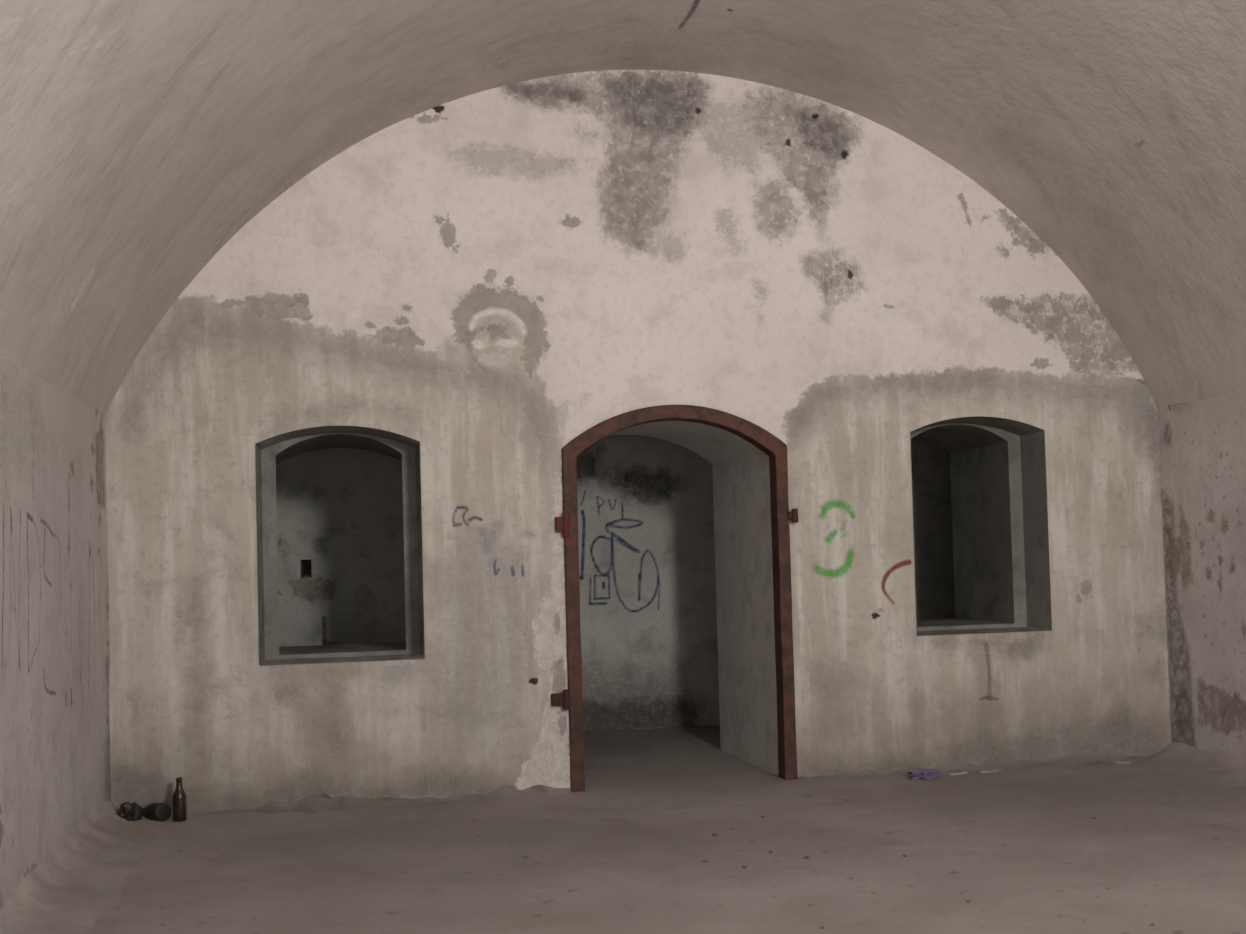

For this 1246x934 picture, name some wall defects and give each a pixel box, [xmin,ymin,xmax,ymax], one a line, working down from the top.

water stain [459,144,574,178]
water stain [503,70,861,260]
water stain [802,251,863,305]
peeling [981,293,1139,376]
peeling [553,458,563,517]
water stain [576,448,602,481]
peeling [515,532,571,790]
flaking render [1162,493,1246,747]